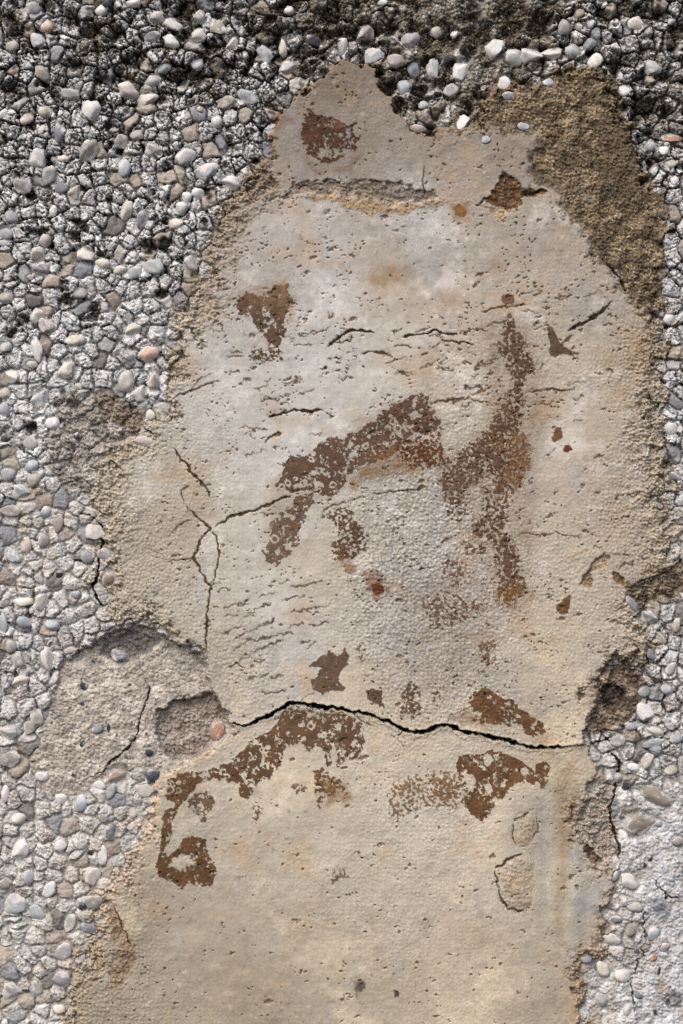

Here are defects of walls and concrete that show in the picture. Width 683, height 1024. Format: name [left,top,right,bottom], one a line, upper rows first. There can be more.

spalling [470,66,666,311]
corrosion [233,283,293,362]
corrosion [261,293,533,629]
crack [169,263,626,752]
crack [519,531,652,575]
crack [85,685,151,780]
spalling [31,623,234,800]
corrosion [309,642,365,694]
corrosion [468,686,546,737]
spalling [586,664,648,735]
corrosion [155,706,365,889]
corrosion [386,749,551,827]